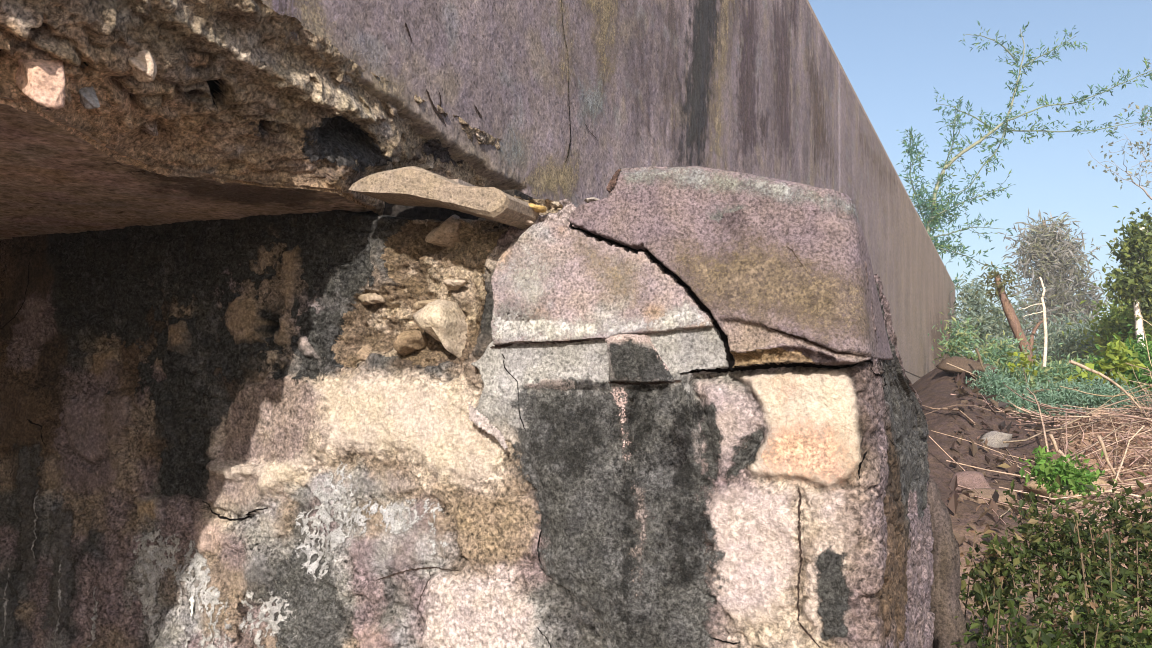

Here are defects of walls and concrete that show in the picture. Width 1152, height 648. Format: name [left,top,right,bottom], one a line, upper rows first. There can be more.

spalling [0,0,501,216]
crack [561,0,596,162]
damp [632,0,747,168]
damp [760,0,797,172]
spalling [514,195,563,215]
damp [49,170,413,428]
spalling [331,218,510,368]
crack [569,223,896,479]
damp [158,435,206,499]
damp [492,239,869,648]
crack [797,488,821,648]